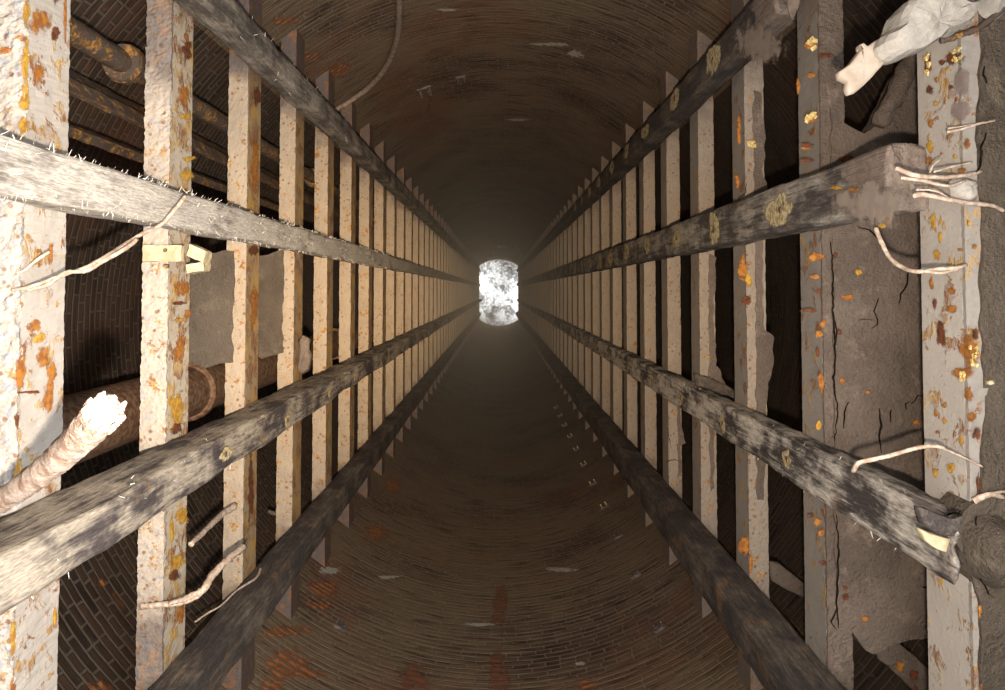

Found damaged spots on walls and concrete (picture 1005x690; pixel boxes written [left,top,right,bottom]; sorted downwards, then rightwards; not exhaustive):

corrosion [18,0,67,134]
corrosion [804,36,832,58]
corrosion [922,46,963,106]
corrosion [177,86,191,120]
corrosion [804,111,818,124]
corrosion [925,141,966,173]
corrosion [173,281,191,322]
corrosion [929,277,957,346]
corrosion [16,320,57,412]
corrosion [174,335,184,363]
corrosion [170,394,183,435]
crack [830,515,840,630]